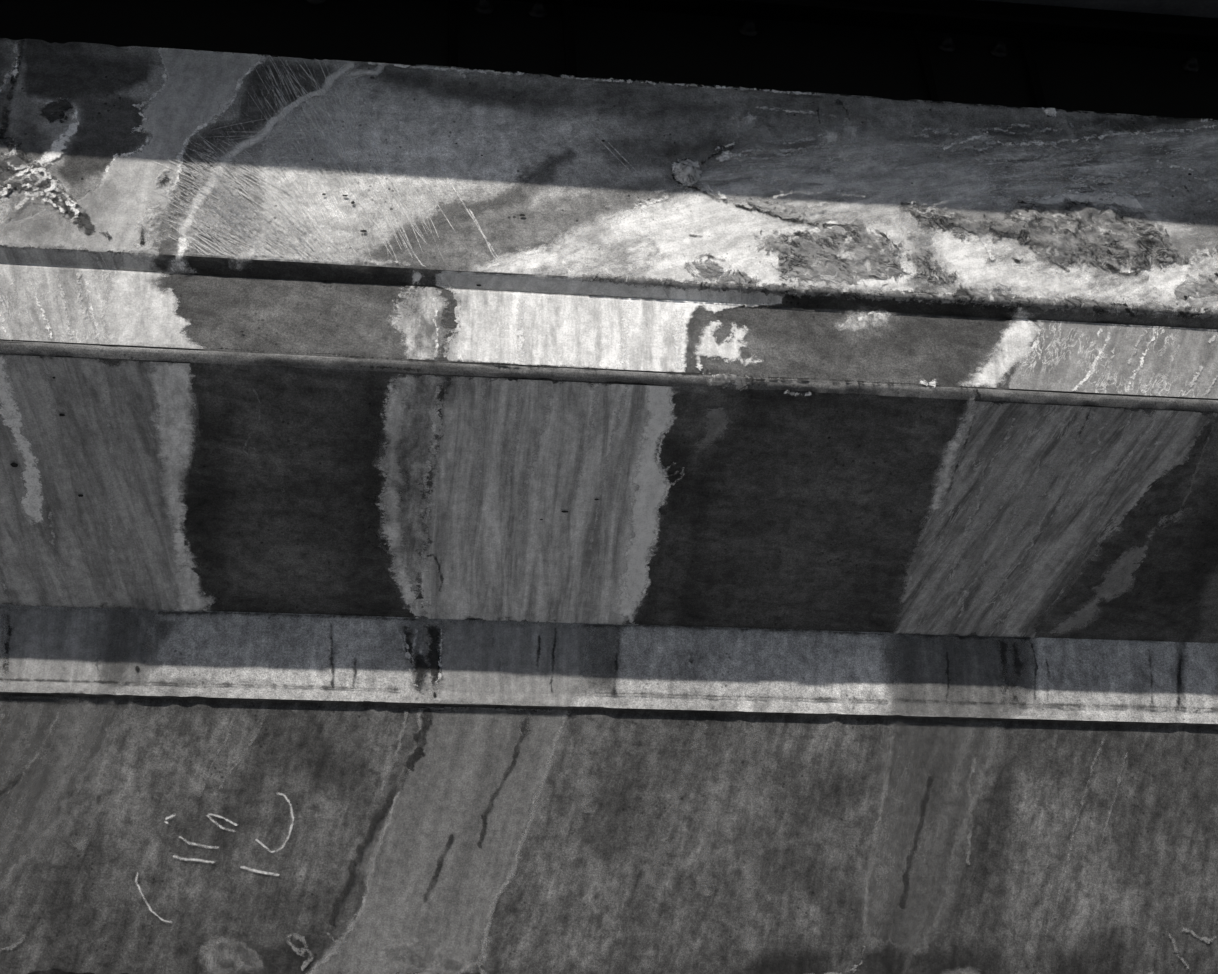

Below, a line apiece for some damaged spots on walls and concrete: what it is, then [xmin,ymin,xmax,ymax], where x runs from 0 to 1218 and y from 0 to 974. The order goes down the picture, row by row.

crack [0,38,24,142]
spalling [0,134,112,240]
spalling [582,196,1218,321]
leakage [0,48,382,888]
leakage [287,99,1218,974]